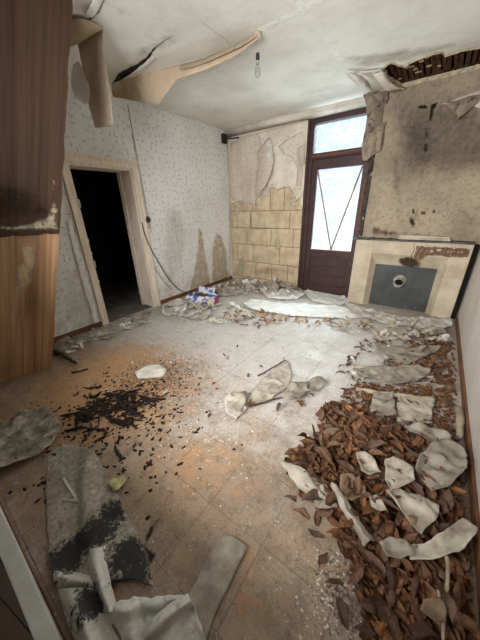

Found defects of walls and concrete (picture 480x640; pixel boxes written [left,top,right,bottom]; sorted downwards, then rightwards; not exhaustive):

crack [111,38,170,84]
damp [405,103,480,164]
damp [192,232,227,287]
flaking render [230,184,304,289]
spalling [414,244,470,260]